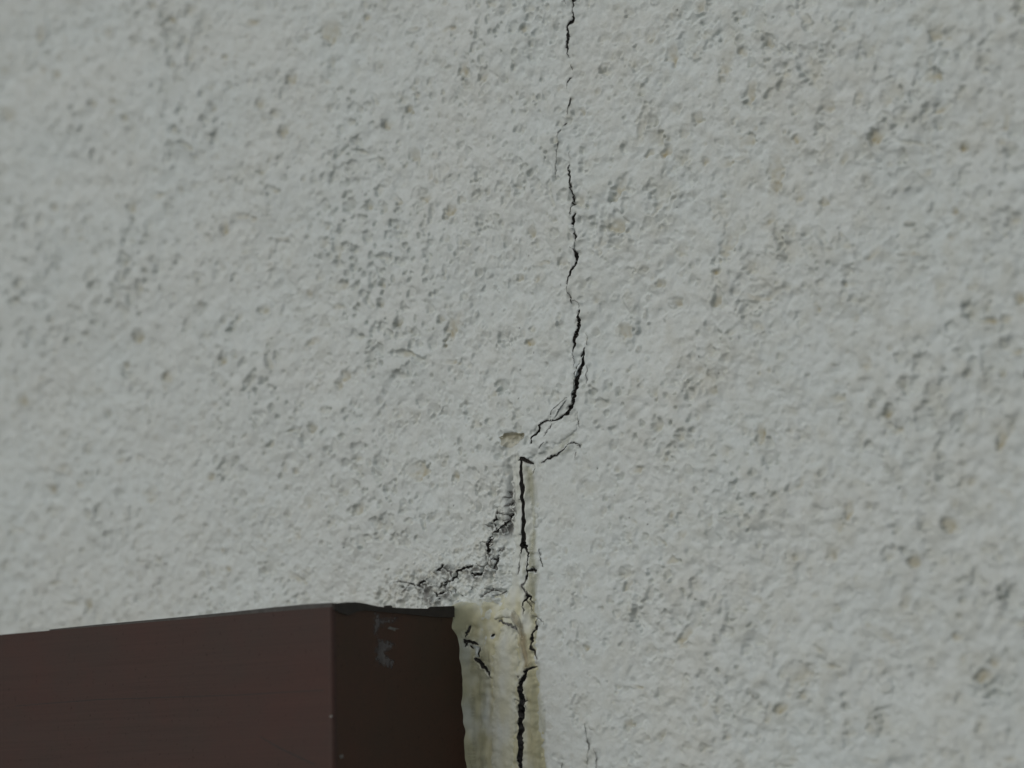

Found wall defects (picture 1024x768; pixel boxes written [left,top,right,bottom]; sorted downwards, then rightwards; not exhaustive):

crack [464,625,491,678]
crack [499,0,588,768]